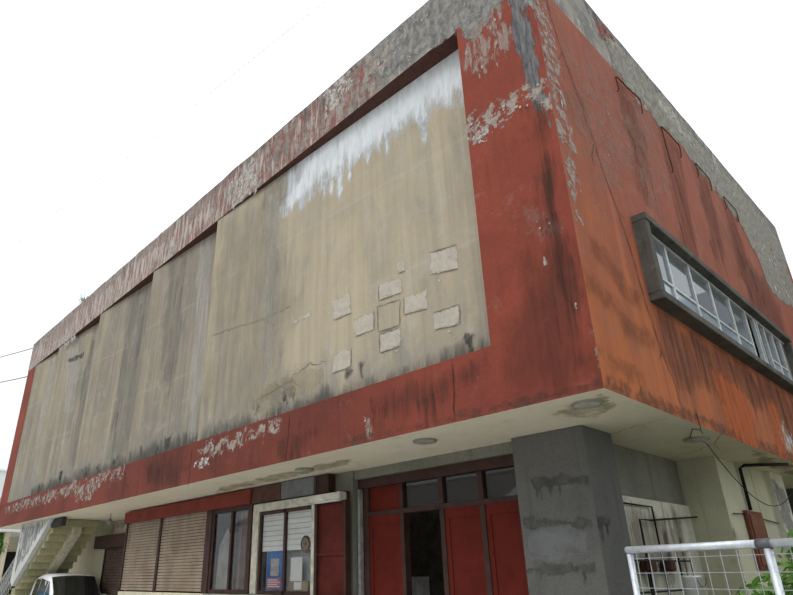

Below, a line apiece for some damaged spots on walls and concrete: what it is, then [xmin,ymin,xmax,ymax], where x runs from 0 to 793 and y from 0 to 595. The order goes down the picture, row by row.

flaking render [323,0,513,118]
peeling [465,0,584,227]
peeling [186,184,221,224]
leakage [323,167,351,199]
flaking render [604,29,793,308]
peeling [137,225,176,259]
leakage [443,334,483,361]
rust [711,368,761,450]
leakage [31,431,217,495]
peeling [193,417,281,468]
peeling [4,465,125,514]
leakage [523,516,610,542]